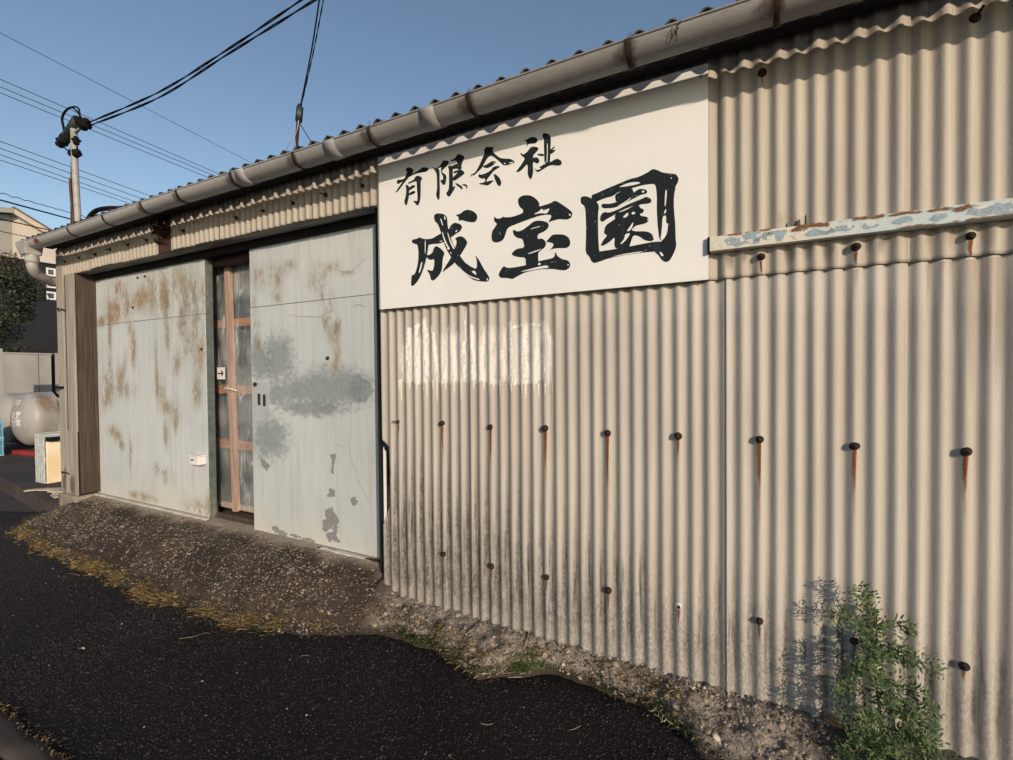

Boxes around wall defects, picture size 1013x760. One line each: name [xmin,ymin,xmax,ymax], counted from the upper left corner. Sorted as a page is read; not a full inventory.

peeling [724,221,879,247]
peeling [966,202,1013,217]
corrosion [98,276,203,345]
peeling [322,488,340,543]